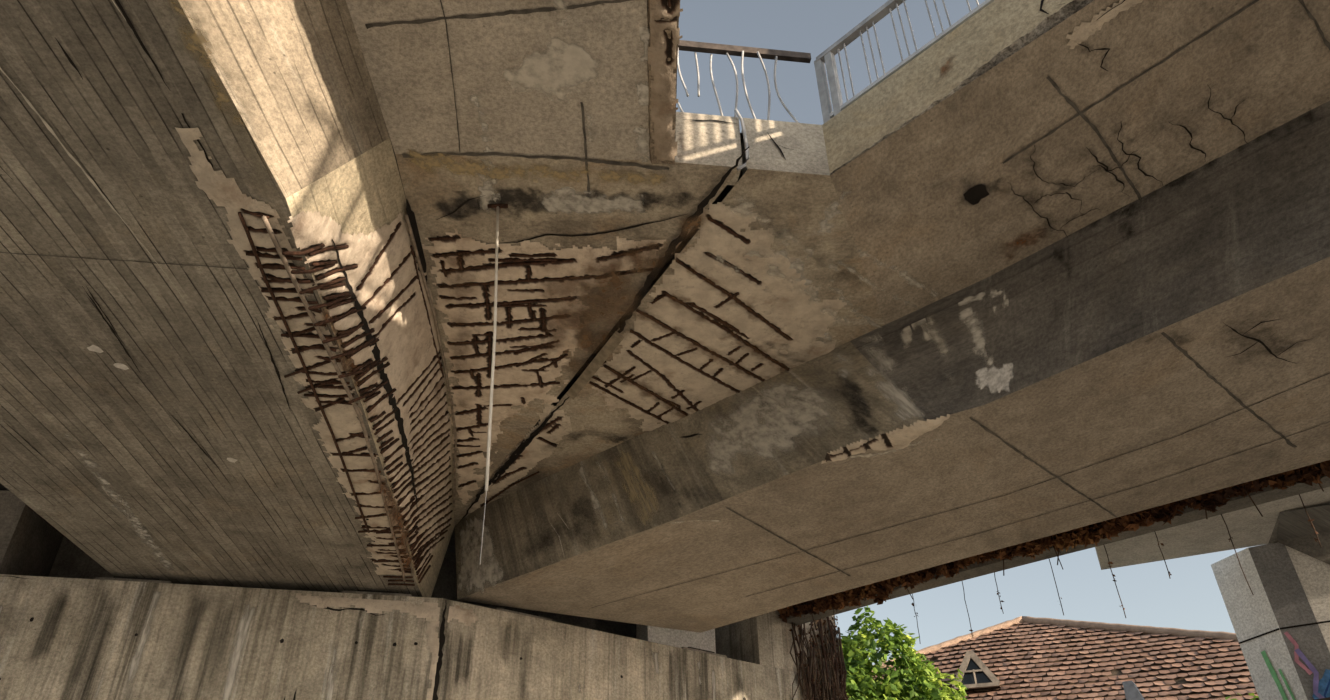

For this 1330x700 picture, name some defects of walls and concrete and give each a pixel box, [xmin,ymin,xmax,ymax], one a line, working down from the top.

spalling [648,0,683,161]
spalling [830,0,1143,175]
crack [439,195,485,219]
crack [505,214,686,243]
water stain [717,231,936,419]
water stain [902,318,948,354]
water stain [958,290,1013,393]
spalling [175,127,847,700]
water stain [708,384,829,472]
water stain [838,355,878,432]
spalling [821,414,950,464]